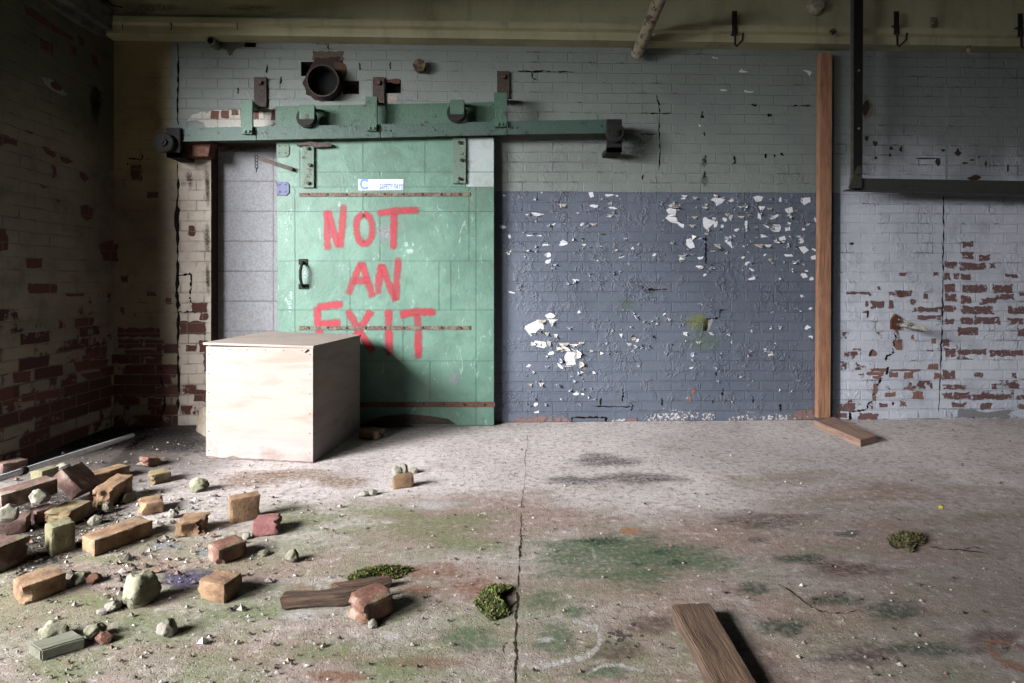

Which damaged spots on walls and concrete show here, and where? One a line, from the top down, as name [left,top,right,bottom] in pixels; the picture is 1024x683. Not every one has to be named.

peeling [187,109,241,128]
peeling [254,107,275,127]
crack [640,97,670,180]
peeling [500,192,816,280]
flaking render [179,303,209,372]
flaking render [193,389,206,402]
peeling [512,309,732,423]
peeling [729,409,816,421]
crack [849,334,897,420]
flaking render [836,241,1024,420]
crack [937,196,945,412]
crack [502,434,528,683]